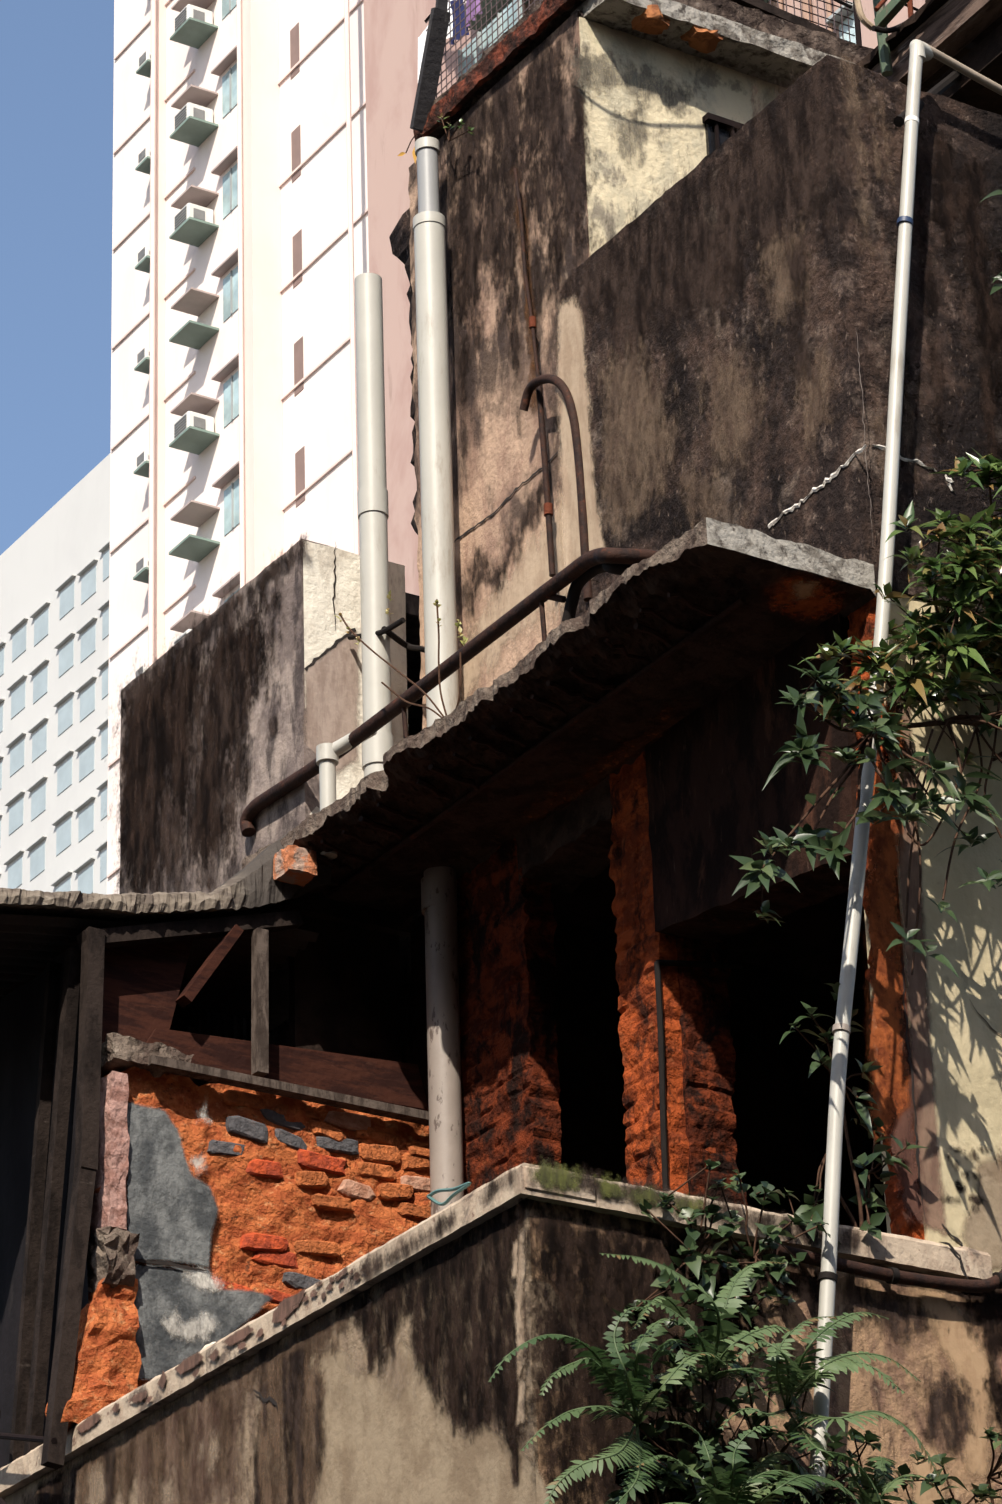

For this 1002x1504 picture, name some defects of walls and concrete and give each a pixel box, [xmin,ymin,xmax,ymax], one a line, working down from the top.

leakage [439,34,891,404]
leakage [903,338,918,494]
leakage [913,126,1002,459]
leakage [110,535,307,894]
crack [304,543,359,772]
peeling [865,703,1002,1269]
spalling [45,1267,362,1433]
leakage [22,1168,865,1504]
leakage [858,1286,936,1343]
leakage [914,1289,1002,1456]